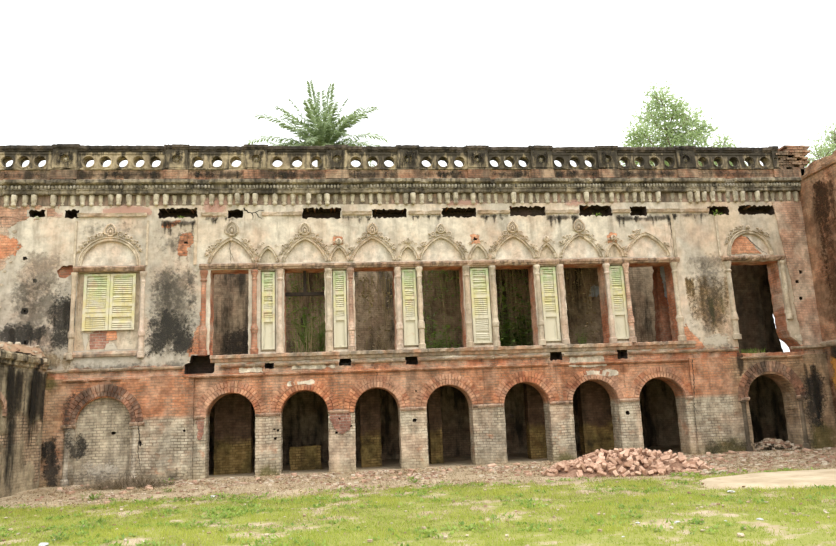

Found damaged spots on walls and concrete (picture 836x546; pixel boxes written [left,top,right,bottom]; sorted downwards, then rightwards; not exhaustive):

flaking render [0,204,60,273]
flaking render [161,220,194,257]
spalling [57,265,73,278]
leakage [0,294,88,352]
flaking render [89,331,109,349]
leakage [145,308,194,357]
leakage [7,368,46,430]
leakage [801,364,828,430]